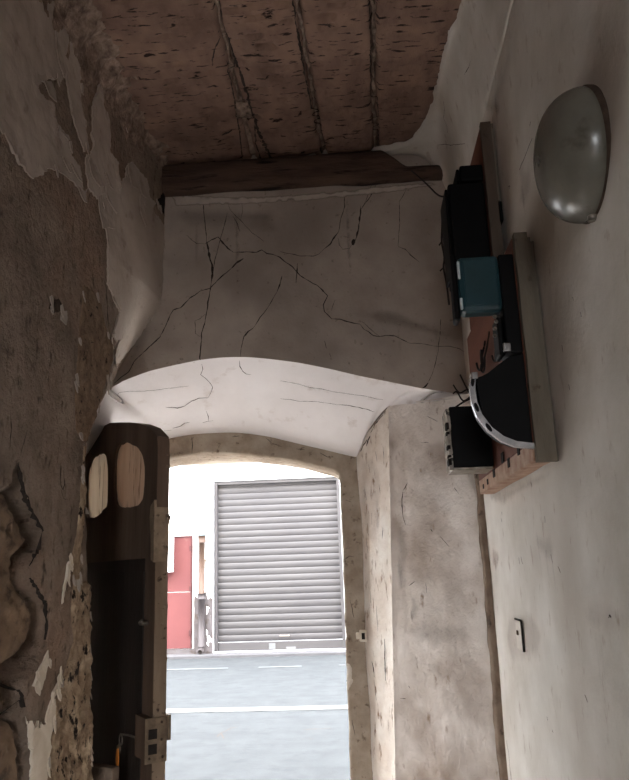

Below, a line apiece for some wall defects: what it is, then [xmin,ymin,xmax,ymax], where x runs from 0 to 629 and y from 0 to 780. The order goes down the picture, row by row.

peeling [0,0,165,780]
crack [116,185,464,431]
crack [284,381,386,471]